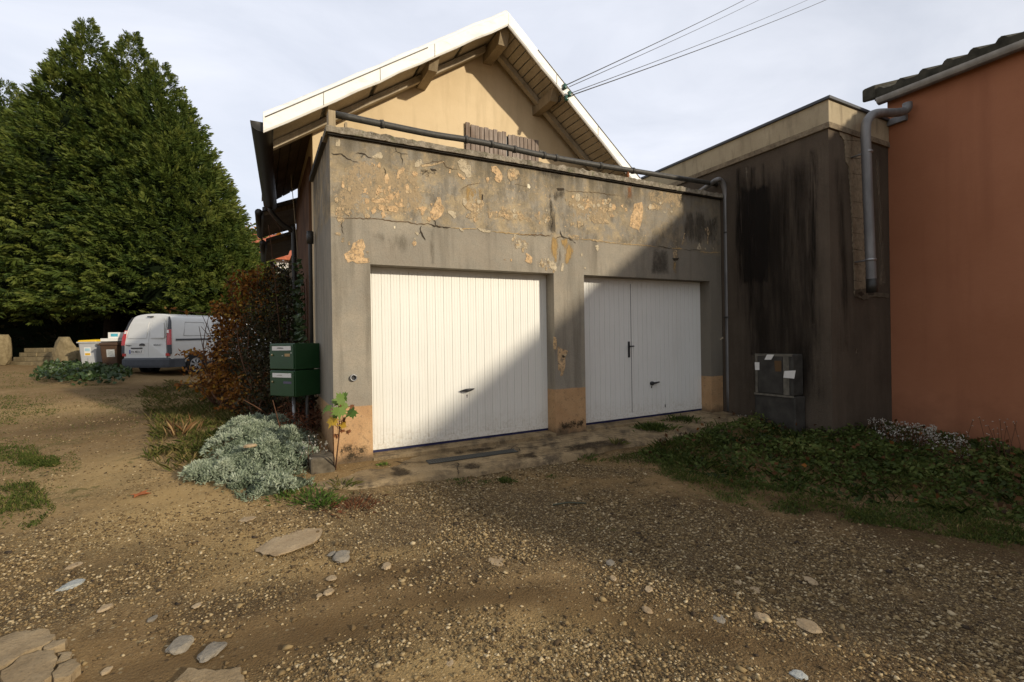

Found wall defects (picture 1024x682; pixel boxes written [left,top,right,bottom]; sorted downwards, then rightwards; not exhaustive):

peeling [335,152,550,264]
crack [336,190,718,253]
peeling [557,188,682,230]
damp [736,168,816,383]